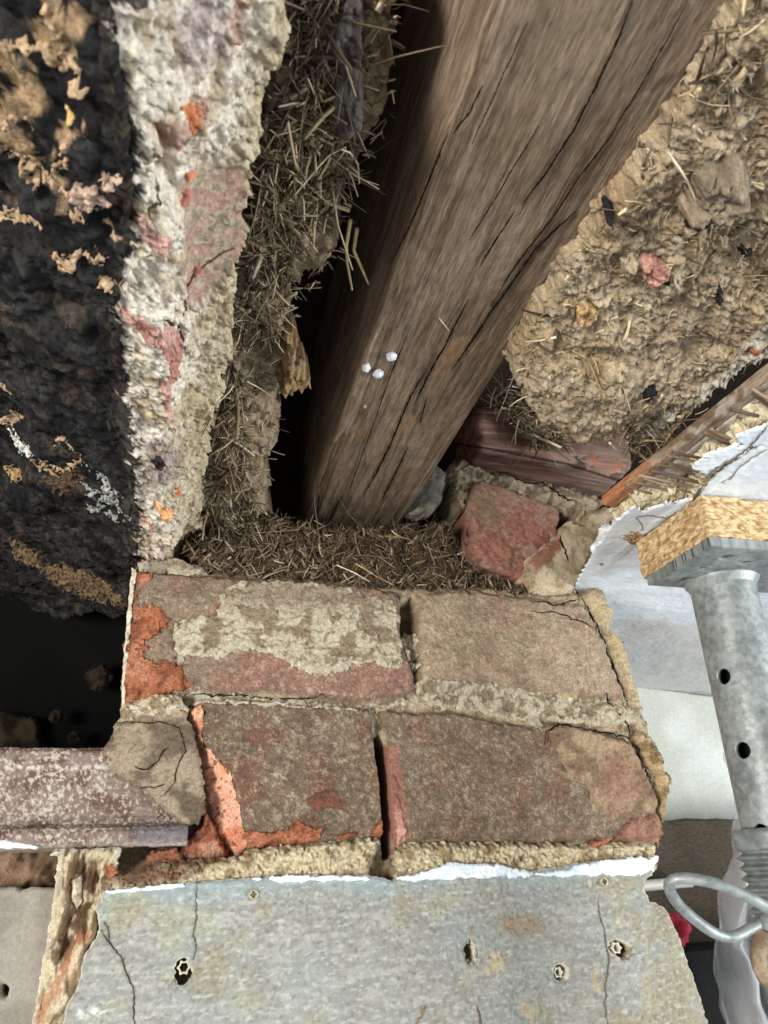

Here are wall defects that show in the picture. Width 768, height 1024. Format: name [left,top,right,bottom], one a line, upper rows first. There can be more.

spalling [27,0,291,703]
crack [531,598,654,789]
crack [112,720,186,796]
crack [99,922,135,1023]
spalling [0,705,323,1024]
crack [190,885,198,958]
peeling [252,874,370,883]
peeling [396,814,664,882]
crack [597,901,610,1023]